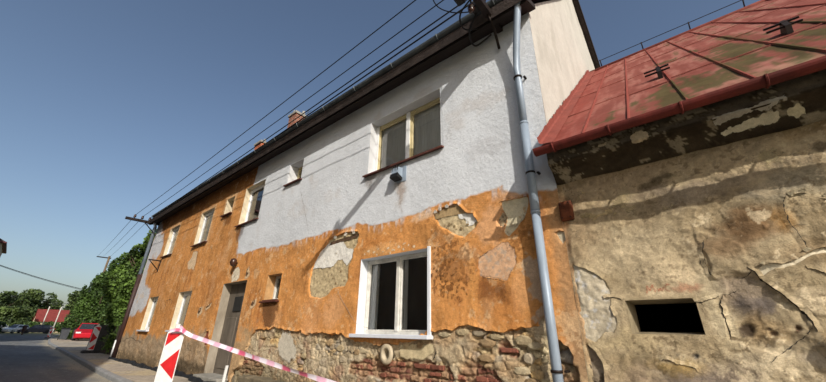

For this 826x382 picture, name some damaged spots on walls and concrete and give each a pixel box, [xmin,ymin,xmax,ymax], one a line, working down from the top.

peeling [630,130,649,144]
peeling [712,95,806,136]
spalling [310,229,360,298]
spalling [432,202,480,237]
peeling [477,195,529,282]
crack [777,193,826,274]
spalling [230,311,553,382]
spalling [558,336,580,382]
spalling [573,261,618,382]
crack [692,238,824,366]